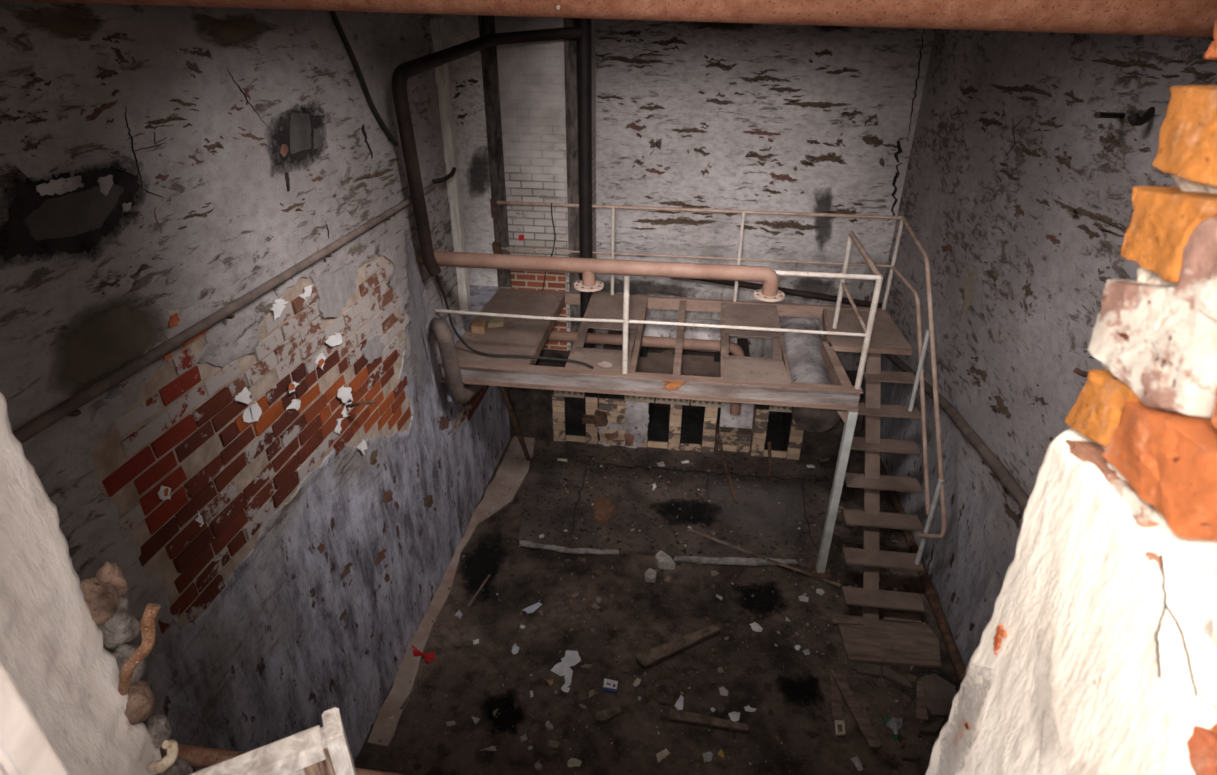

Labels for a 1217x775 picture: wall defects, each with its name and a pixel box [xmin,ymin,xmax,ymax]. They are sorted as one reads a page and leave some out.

peeling [36,175,114,196]
crack [125,107,167,233]
peeling [597,93,711,177]
peeling [631,196,817,236]
peeling [698,55,897,197]
crack [887,30,925,221]
spalling [1036,20,1217,550]
spalling [66,240,415,646]
spalling [597,401,649,448]
spalling [1145,551,1164,574]
crack [1155,554,1217,710]
spalling [1186,723,1217,775]